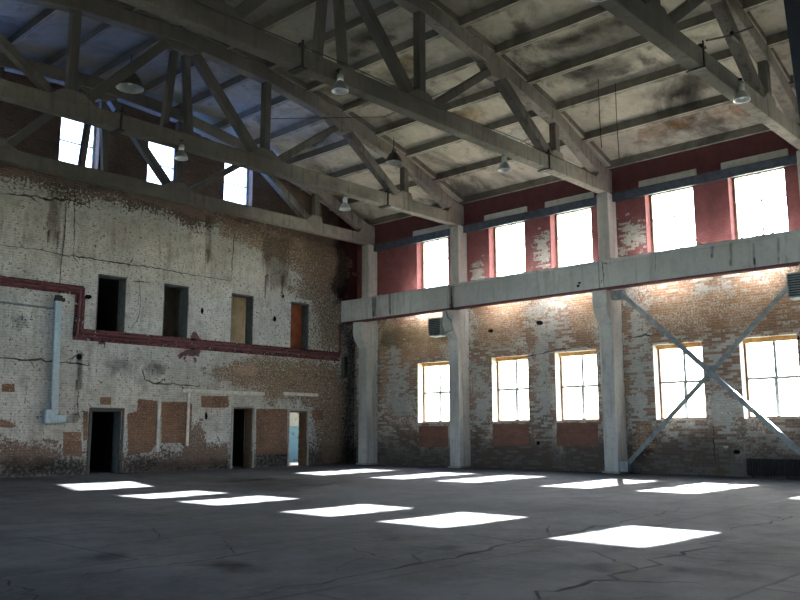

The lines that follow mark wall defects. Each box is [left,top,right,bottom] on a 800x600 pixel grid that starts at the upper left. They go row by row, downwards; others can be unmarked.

crack [4,187,235,331]
peeling [529,228,551,272]
peeling [617,213,647,257]
crack [0,355,90,367]
crack [142,370,200,389]
peeling [200,209,357,464]
peeling [0,411,88,469]
peeling [126,396,229,472]
crack [234,507,800,599]